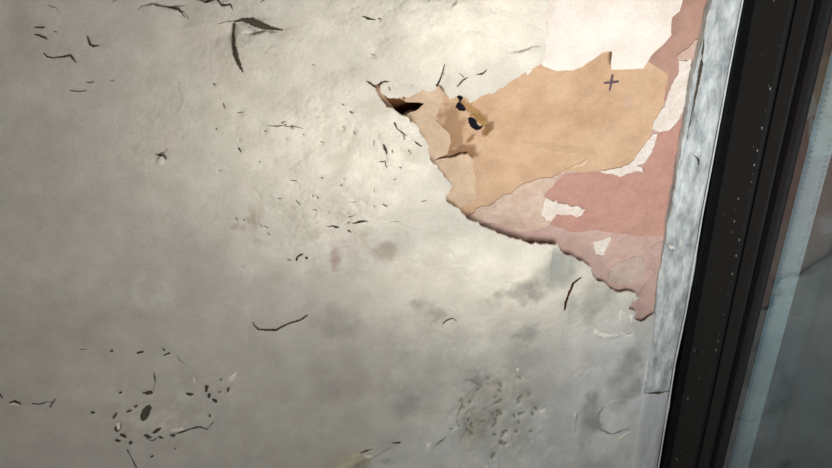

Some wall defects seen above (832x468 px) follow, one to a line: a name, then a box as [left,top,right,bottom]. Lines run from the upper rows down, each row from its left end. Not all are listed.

crack [34,27,99,63]
crack [139,0,283,72]
peeling [373,81,393,107]
peeling [399,0,707,339]
crack [564,277,582,311]
crack [252,315,308,331]
crack [0,394,56,408]